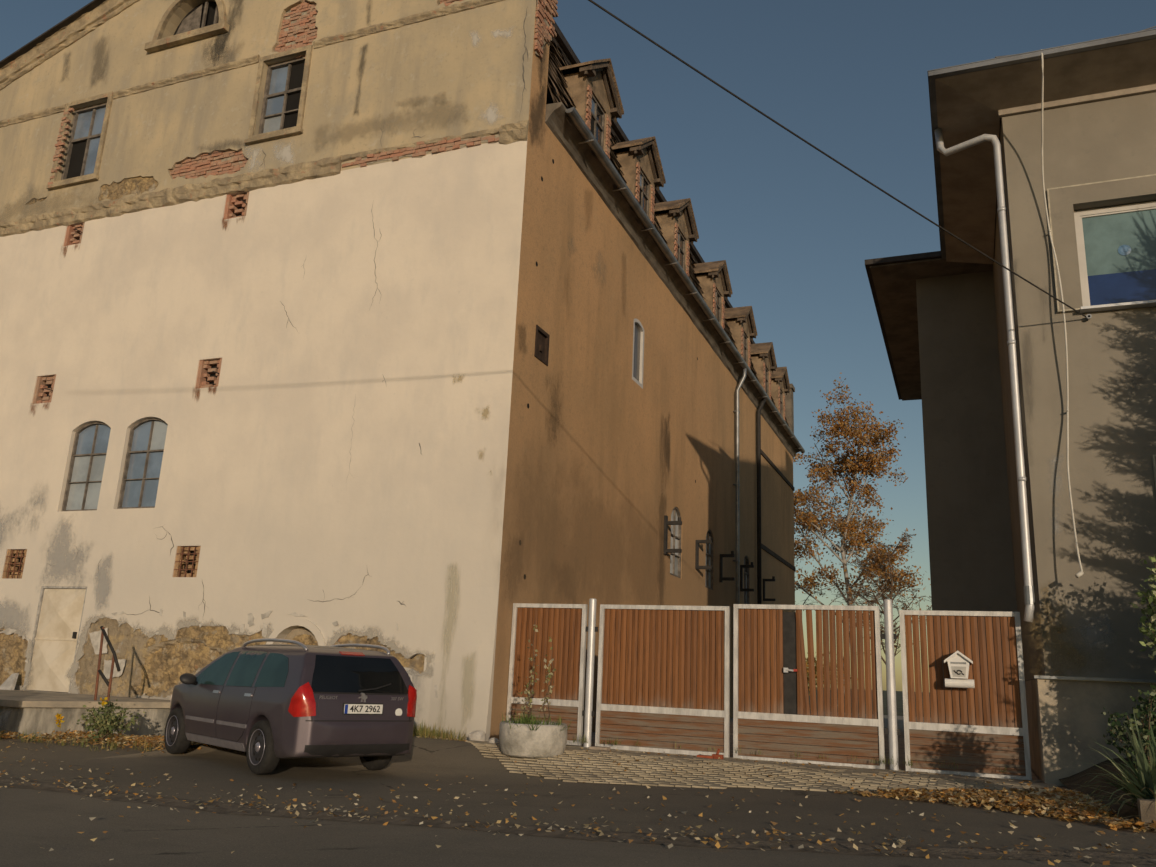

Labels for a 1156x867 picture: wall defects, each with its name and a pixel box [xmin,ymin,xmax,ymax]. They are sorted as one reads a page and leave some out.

spalling [274,0,318,59]
spalling [534,0,558,58]
spalling [27,108,74,205]
spalling [99,176,159,201]
spalling [170,150,248,179]
spalling [341,134,499,168]
damp [96,558,110,604]
peeling [0,623,32,690]
peeling [67,608,272,700]
peeling [287,612,438,698]